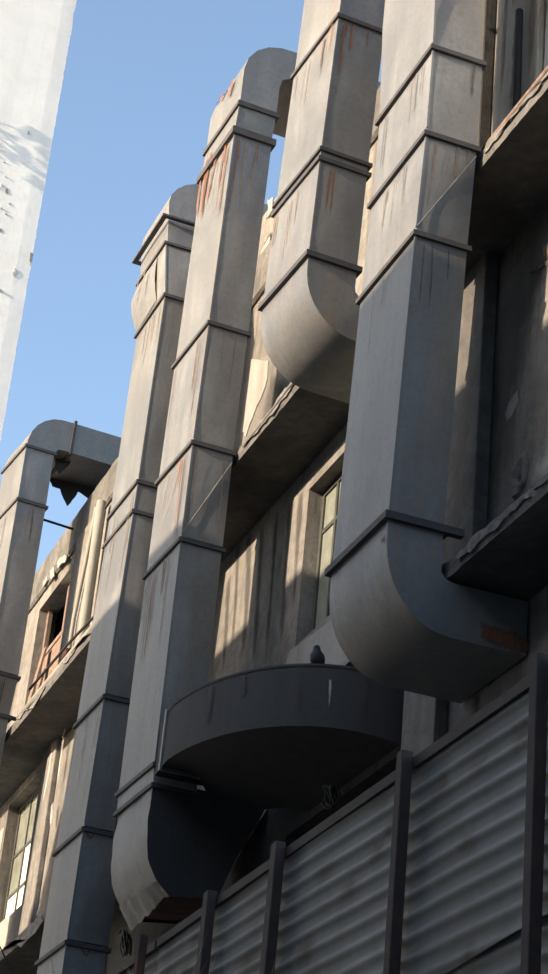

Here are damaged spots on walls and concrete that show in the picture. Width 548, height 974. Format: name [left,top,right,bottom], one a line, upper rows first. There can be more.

rust [196,137,259,216]
spalling [455,438,548,559]